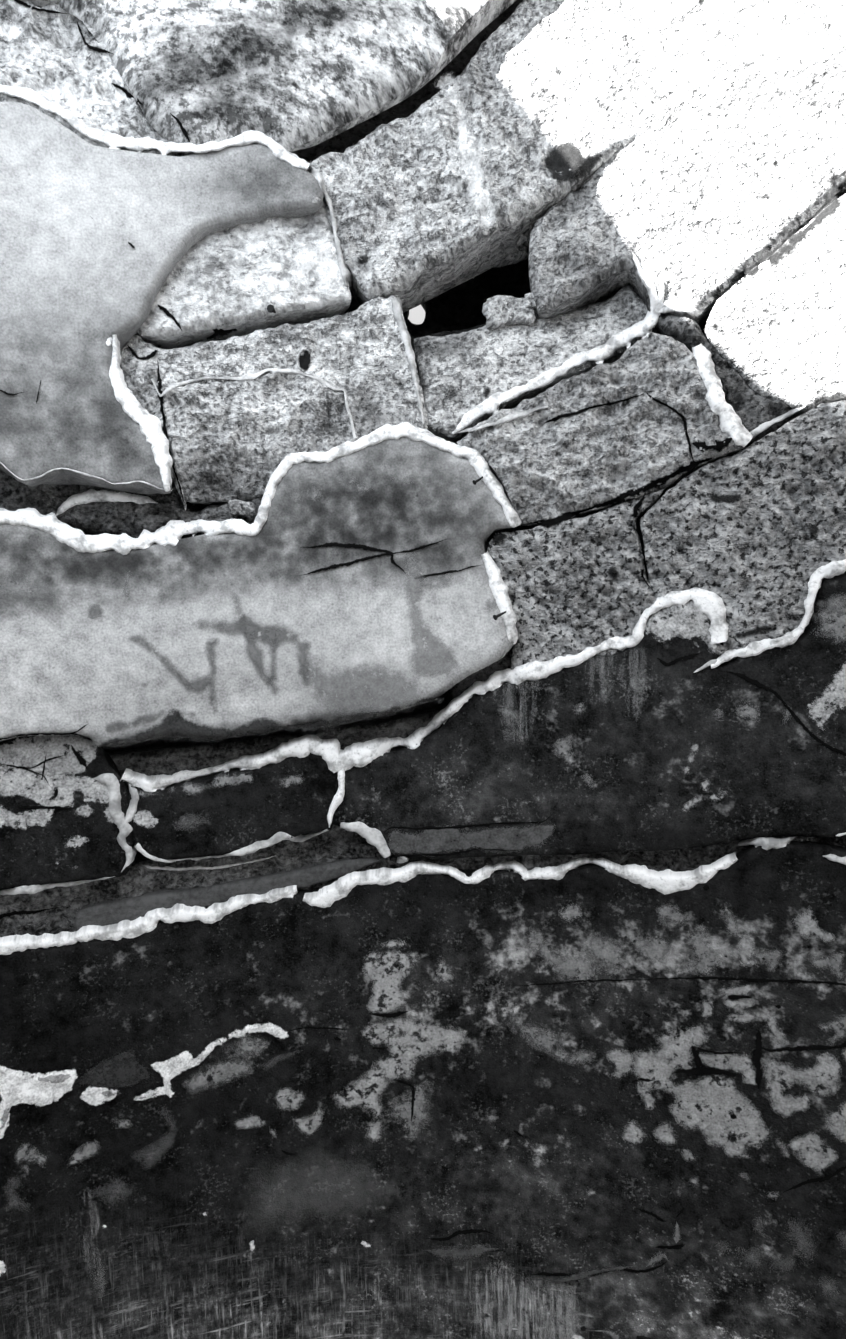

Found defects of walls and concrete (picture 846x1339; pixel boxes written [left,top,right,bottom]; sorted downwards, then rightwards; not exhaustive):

spalling [545,142,615,183]
spalling [707,269,747,298]
crack [522,392,732,588]
crack [300,539,483,579]
peeling [807,664,846,729]
peeling [0,765,114,829]
peeling [133,792,159,829]
peeling [183,774,252,794]
peeling [66,835,89,848]
peeling [23,1050,156,1099]
peeling [187,1036,289,1092]
peeling [236,1116,276,1137]